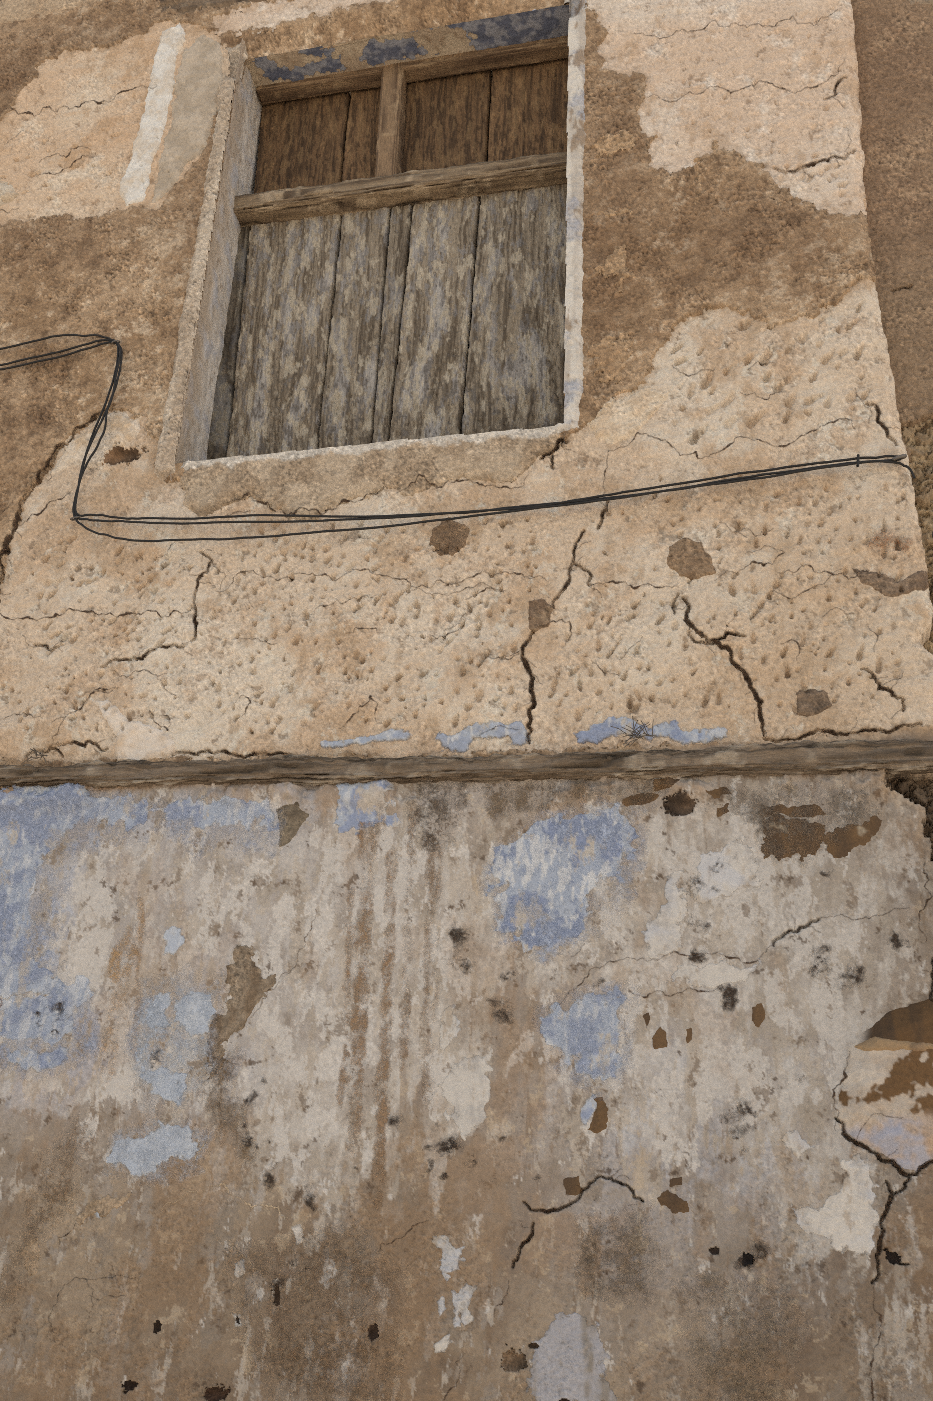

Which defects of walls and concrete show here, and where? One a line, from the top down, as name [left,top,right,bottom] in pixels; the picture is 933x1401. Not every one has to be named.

spalling [0,0,398,225]
spalling [252,0,867,217]
crack [0,409,106,555]
spalling [0,278,933,764]
crack [604,404,888,476]
crack [2,509,914,751]
damp [415,784,467,850]
damp [449,929,467,943]
damp [718,985,738,1010]
damp [426,1137,458,1180]
crack [832,1070,933,1269]
peeling [526,1312,618,1401]